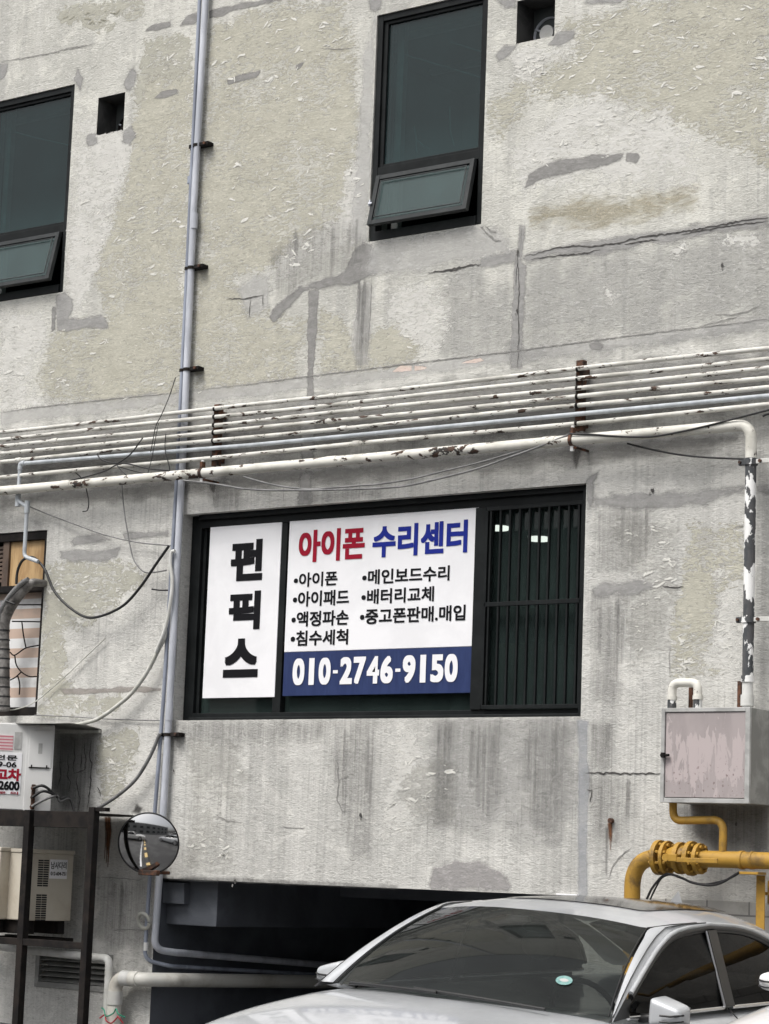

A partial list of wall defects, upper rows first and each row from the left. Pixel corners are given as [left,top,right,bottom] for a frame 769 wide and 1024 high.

crack [202,217,769,390]
crack [587,772,660,800]